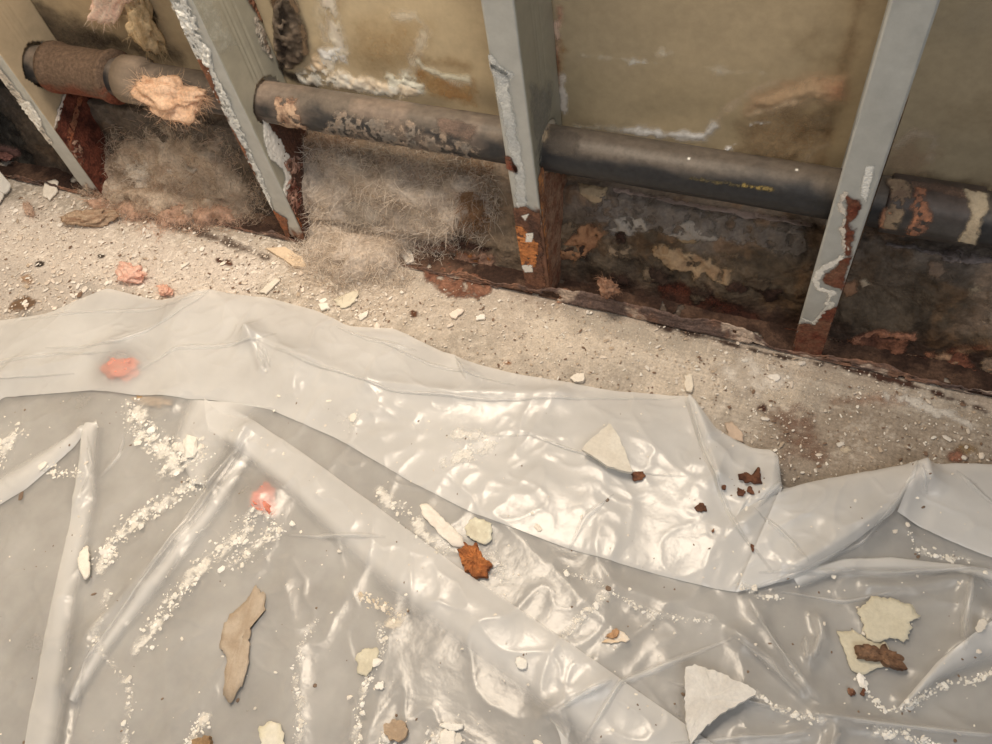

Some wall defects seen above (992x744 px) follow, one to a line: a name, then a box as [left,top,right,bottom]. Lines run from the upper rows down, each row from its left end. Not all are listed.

leakage [35,3,180,60]
leakage [271,0,472,102]
rust [54,93,111,197]
spalling [579,183,608,204]
spalling [560,221,783,304]
rust [658,282,760,320]
rust [784,97,992,375]